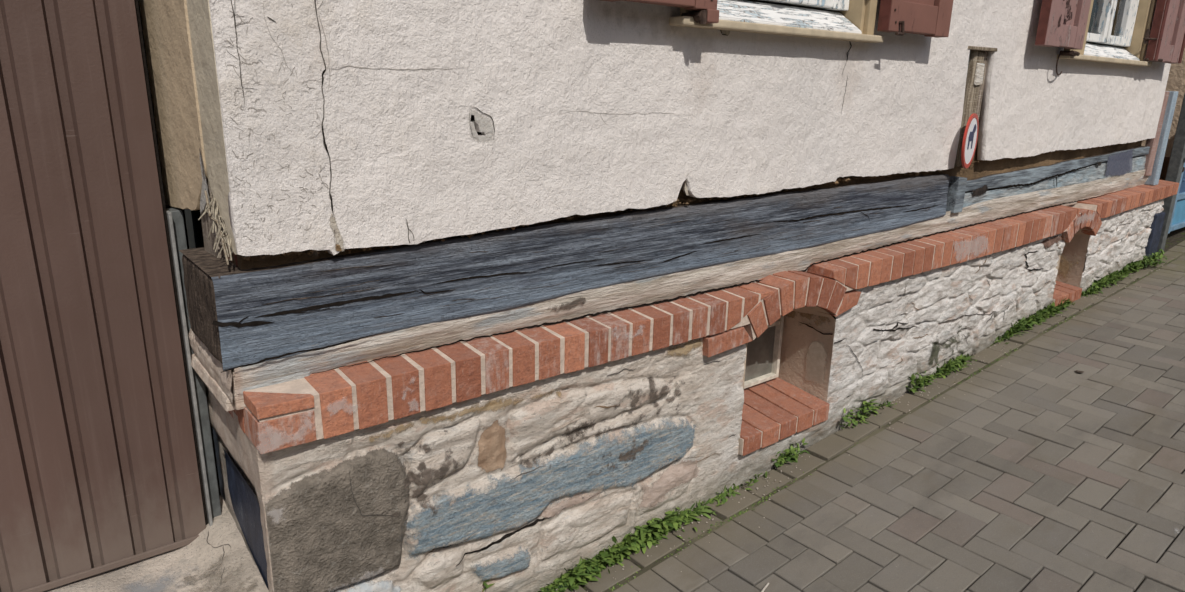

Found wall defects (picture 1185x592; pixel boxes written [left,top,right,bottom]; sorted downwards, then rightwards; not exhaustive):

spalling [198,10,400,265]
spalling [469,106,495,142]
spalling [419,225,529,244]
spalling [550,182,760,221]
crack [212,0,1129,374]
crack [800,322,864,397]
crack [550,399,615,433]
crack [429,491,649,566]